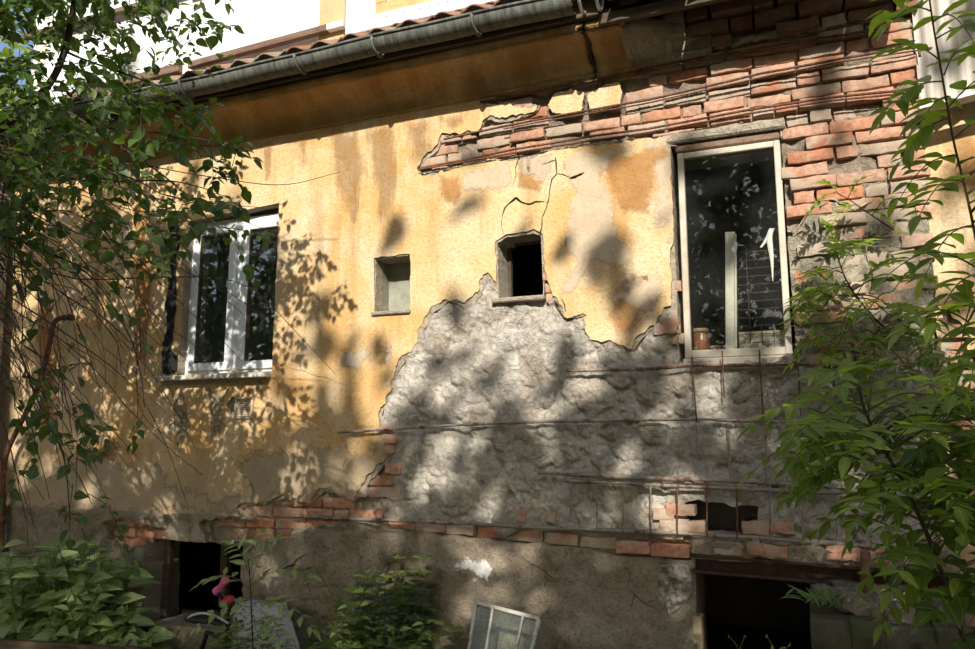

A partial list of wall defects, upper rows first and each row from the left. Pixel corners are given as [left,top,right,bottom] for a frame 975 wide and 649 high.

crack [579,22,598,73]
crack [504,161,583,236]
spalling [14,16,938,558]
spalling [920,303,969,374]
spalling [948,358,975,392]
spalling [948,412,975,435]